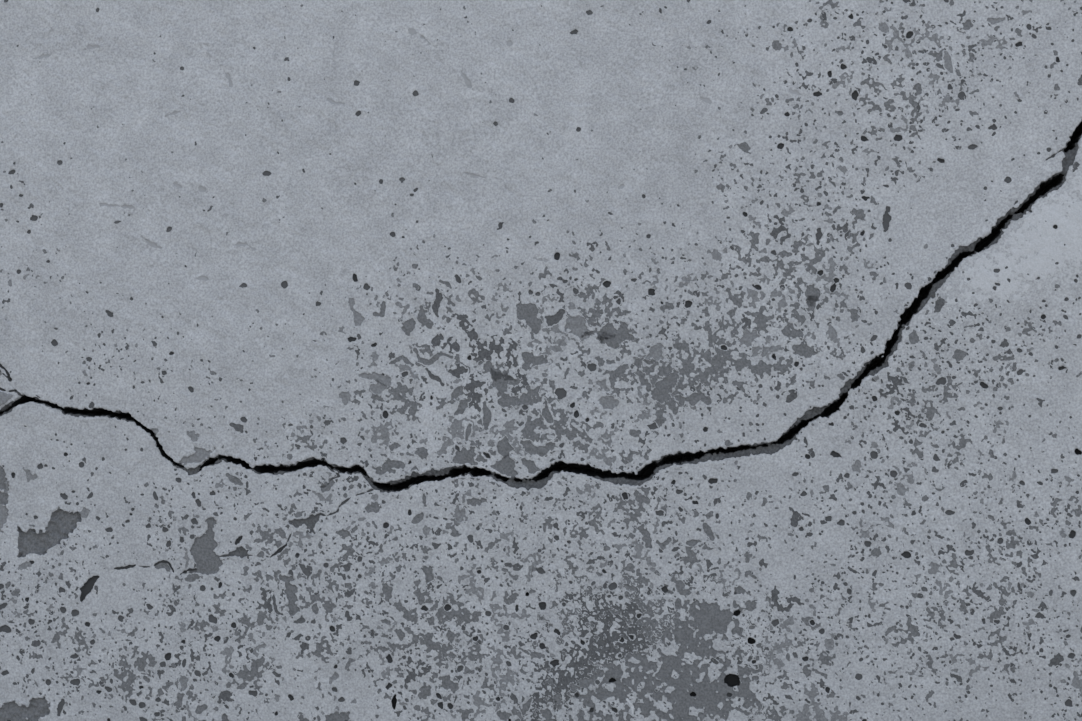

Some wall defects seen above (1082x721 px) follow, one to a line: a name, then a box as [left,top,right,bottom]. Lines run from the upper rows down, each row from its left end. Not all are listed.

crack [0,121,1082,575]